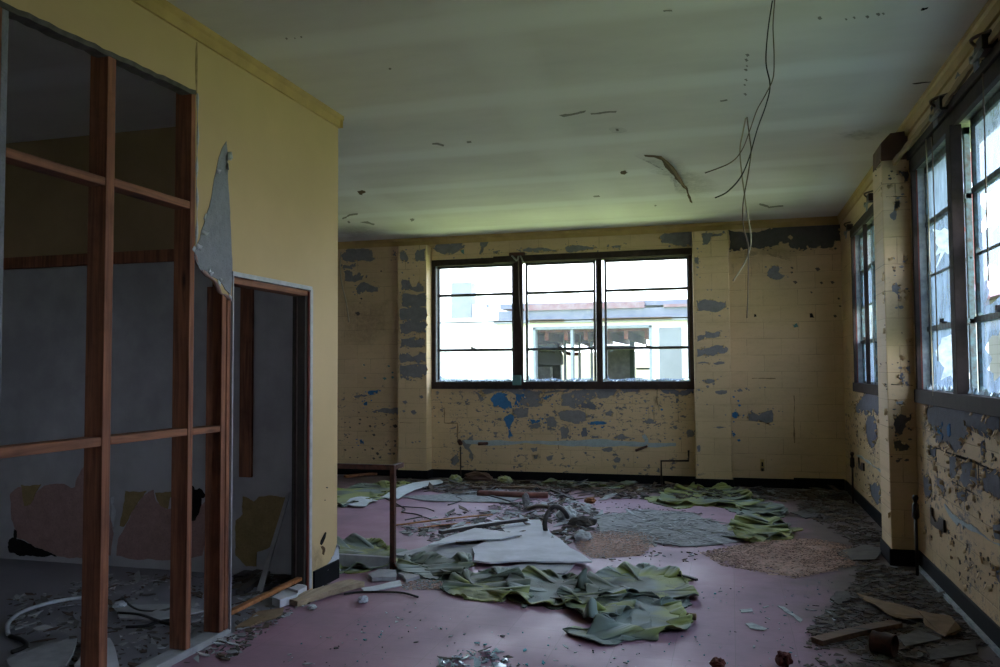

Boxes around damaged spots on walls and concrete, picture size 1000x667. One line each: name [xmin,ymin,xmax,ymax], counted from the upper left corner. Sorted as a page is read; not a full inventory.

peeling [658,224,841,278]
peeling [696,289,729,316]
peeling [341,243,465,460]
peeling [466,330,783,469]
peeling [848,355,1000,541]
spalling [192,485,205,521]
spalling [8,529,57,557]
peeling [922,529,1000,592]